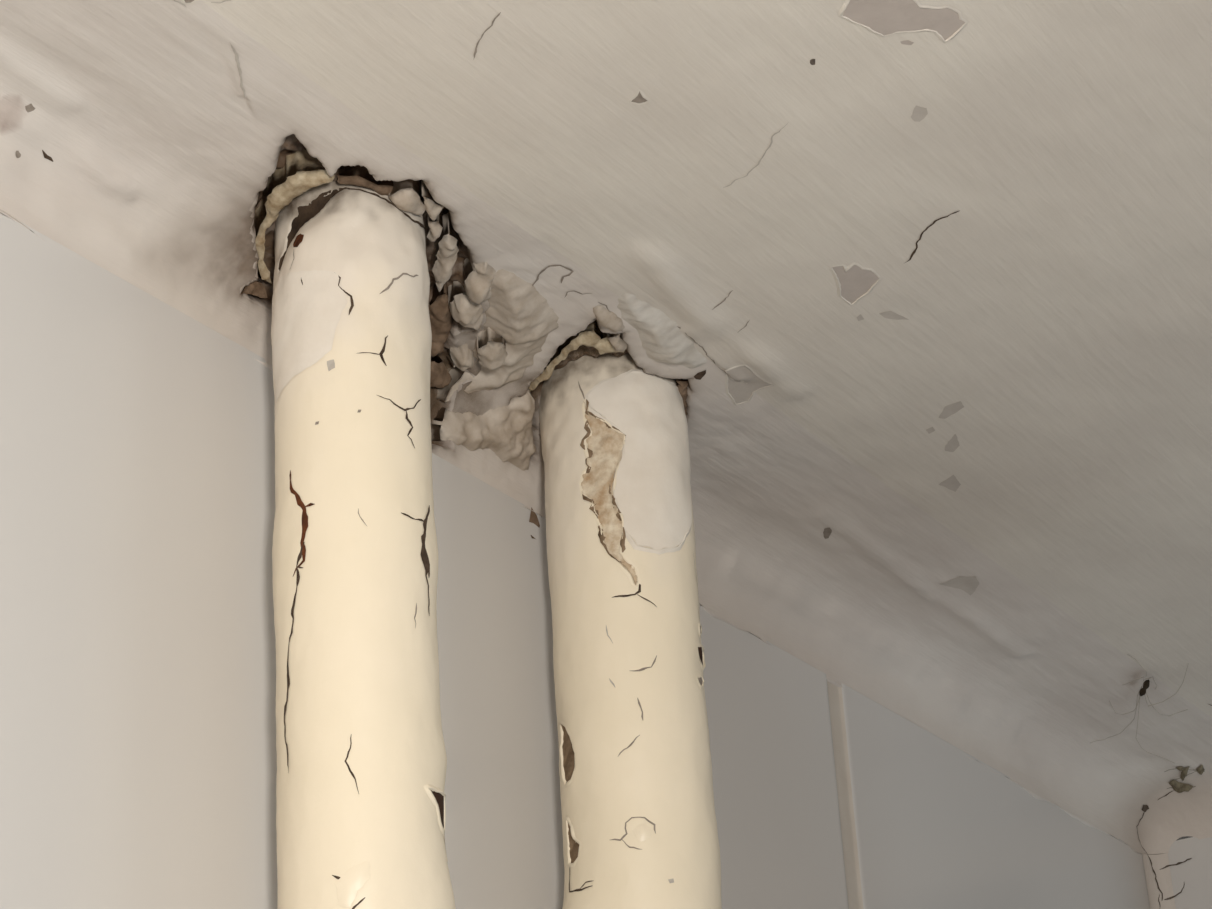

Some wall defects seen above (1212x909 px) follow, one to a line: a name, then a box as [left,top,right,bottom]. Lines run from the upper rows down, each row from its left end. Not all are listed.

peeling [838,0,970,45]
crack [905,211,959,263]
crack [338,273,419,314]
flaking render [241,150,707,471]
peeling [829,262,883,321]
crack [361,336,388,366]
crack [377,395,421,448]
crack [402,505,430,628]
crack [284,470,314,773]
crack [612,584,657,607]
crack [345,737,359,793]
crack [1137,790,1192,905]